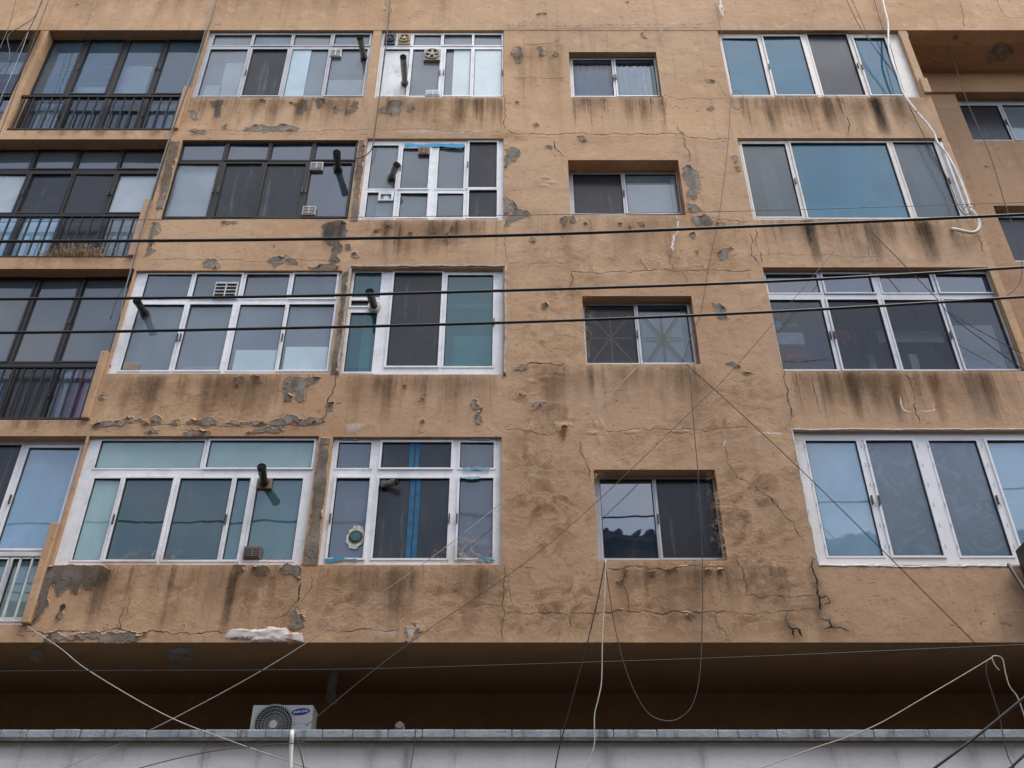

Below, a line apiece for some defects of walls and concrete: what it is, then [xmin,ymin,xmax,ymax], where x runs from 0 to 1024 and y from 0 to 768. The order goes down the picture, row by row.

damp [859,97,886,128]
peeling [504,146,521,168]
peeling [502,196,532,226]
peeling [682,164,726,254]
peeling [90,140,366,437]
peeling [31,563,148,644]
peeling [288,605,307,631]
crack [501,558,849,639]